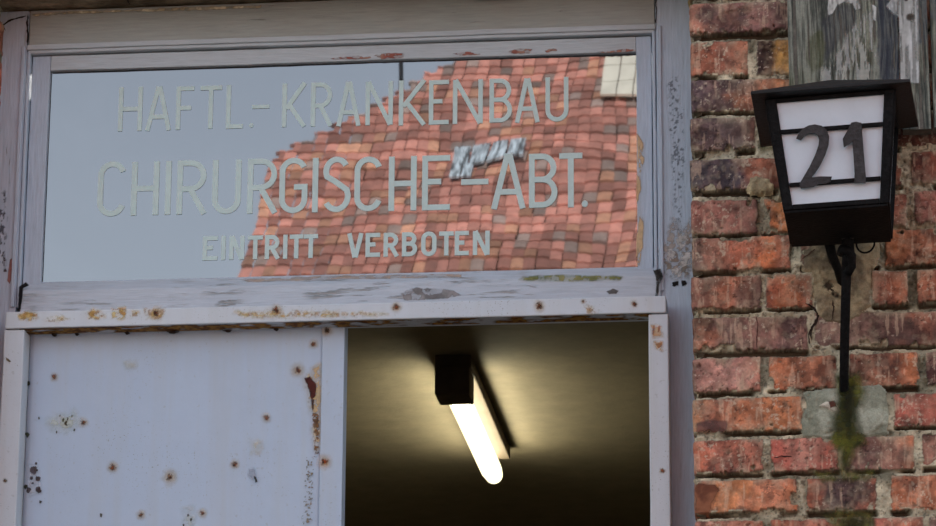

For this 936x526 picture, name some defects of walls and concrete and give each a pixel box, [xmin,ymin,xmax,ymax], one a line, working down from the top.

peeling [0,192,12,284]
peeling [331,274,459,300]
peeling [663,223,692,287]
corrosion [19,308,479,337]
corrosion [495,302,662,349]
corrosion [296,367,328,524]
water stain [817,374,872,480]
water stain [825,511,874,526]